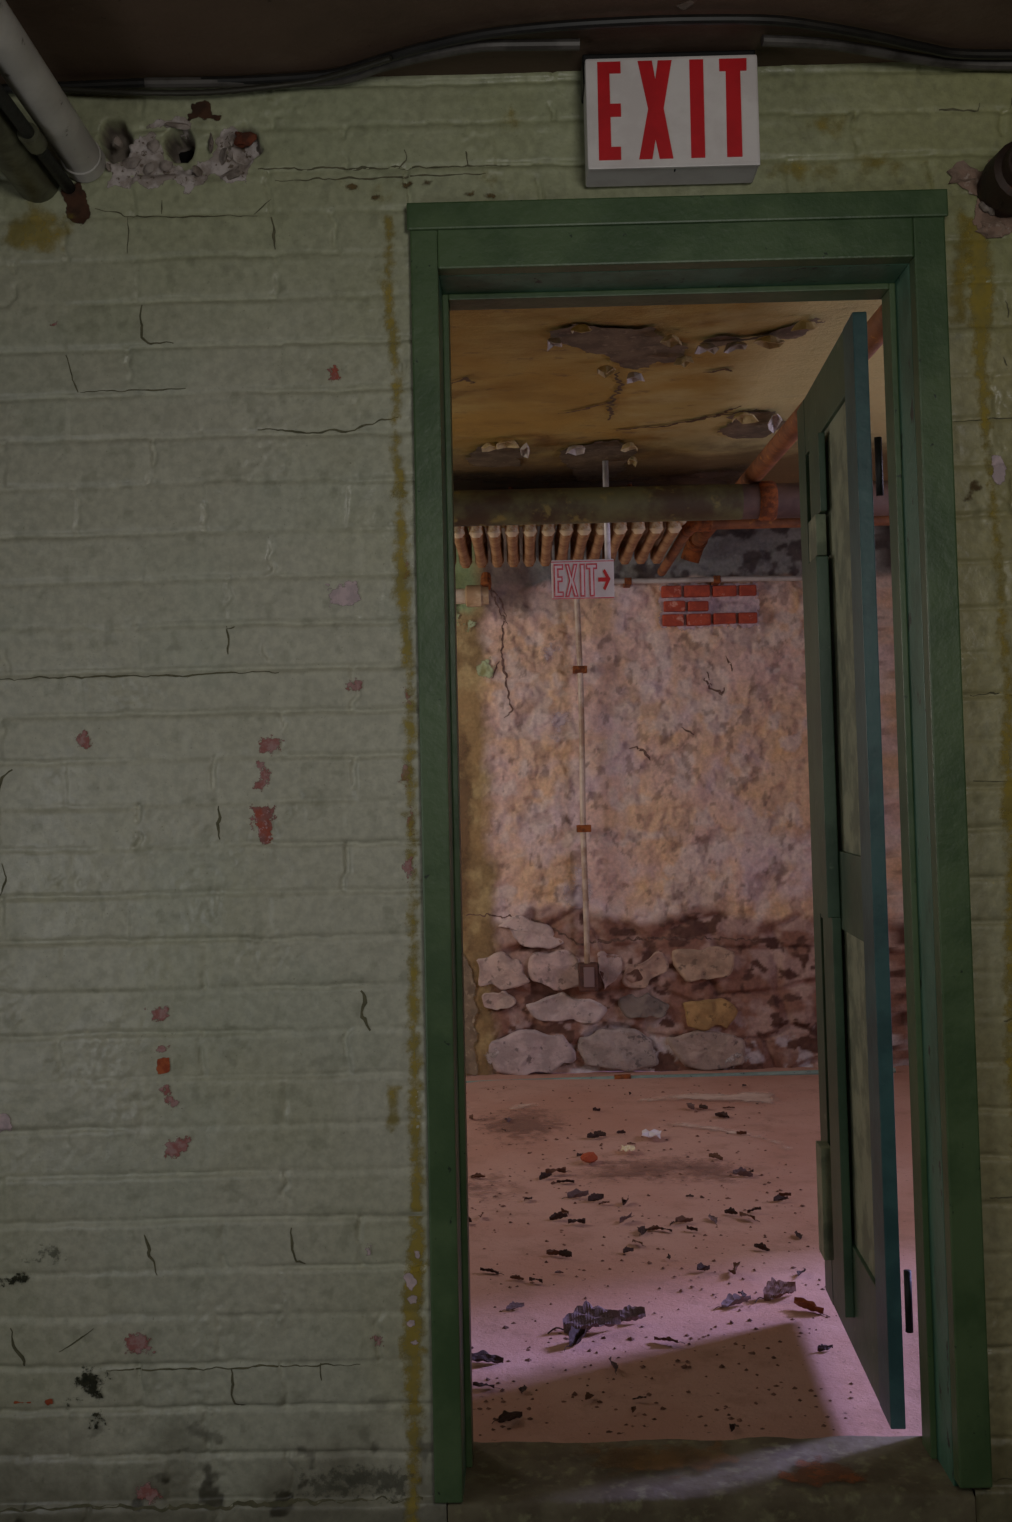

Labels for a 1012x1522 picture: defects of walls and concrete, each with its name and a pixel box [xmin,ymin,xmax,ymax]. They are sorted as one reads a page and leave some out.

spalling [106,116,260,194]
flaking render [947,159,1012,238]
leakage [383,216,398,365]
peeling [547,318,825,384]
leakage [392,383,417,875]
peeling [249,735,285,844]
leakage [301,902,426,1522]